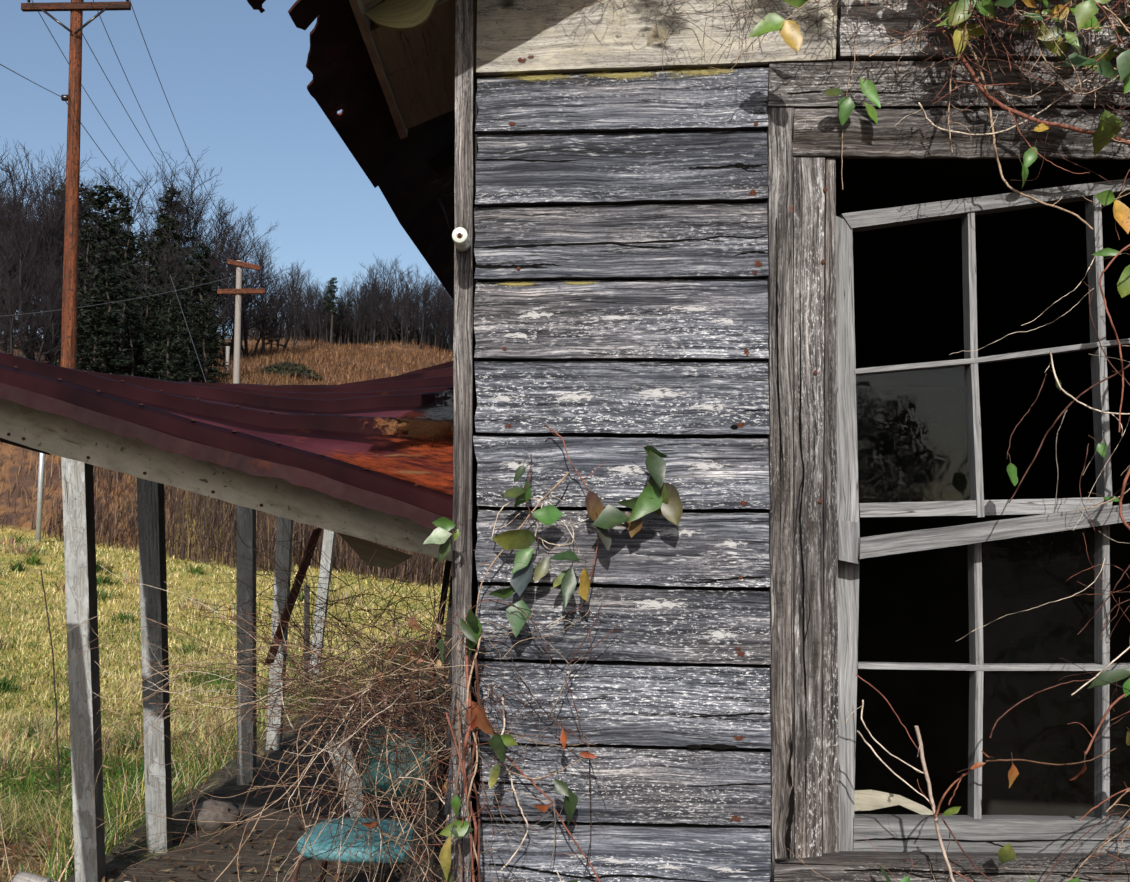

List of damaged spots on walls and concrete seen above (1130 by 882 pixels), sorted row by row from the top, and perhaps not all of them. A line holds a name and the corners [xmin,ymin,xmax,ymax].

damp [633,0,685,33]
corrosion [331,410,453,495]